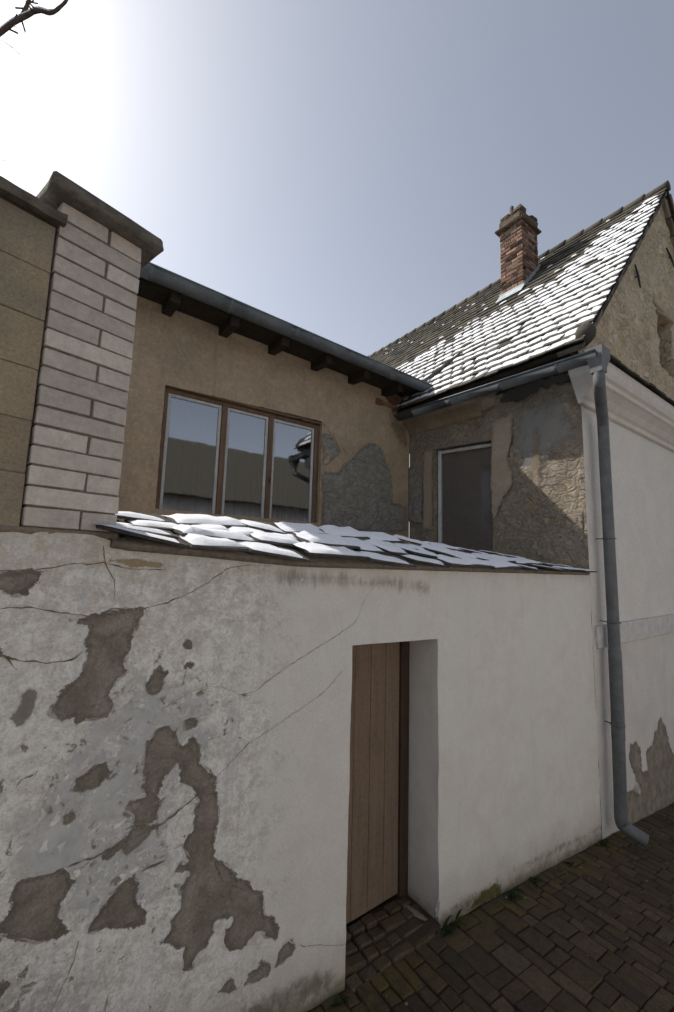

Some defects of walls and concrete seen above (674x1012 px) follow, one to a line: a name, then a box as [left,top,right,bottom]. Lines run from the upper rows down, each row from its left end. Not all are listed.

spalling [321,433,423,532]
crack [0,546,249,616]
crack [0,652,82,669]
peeling [47,606,144,728]
crack [161,581,380,710]
peeling [0,639,296,994]
crack [67,671,342,868]
peeling [627,717,674,824]
spalling [0,957,39,1012]